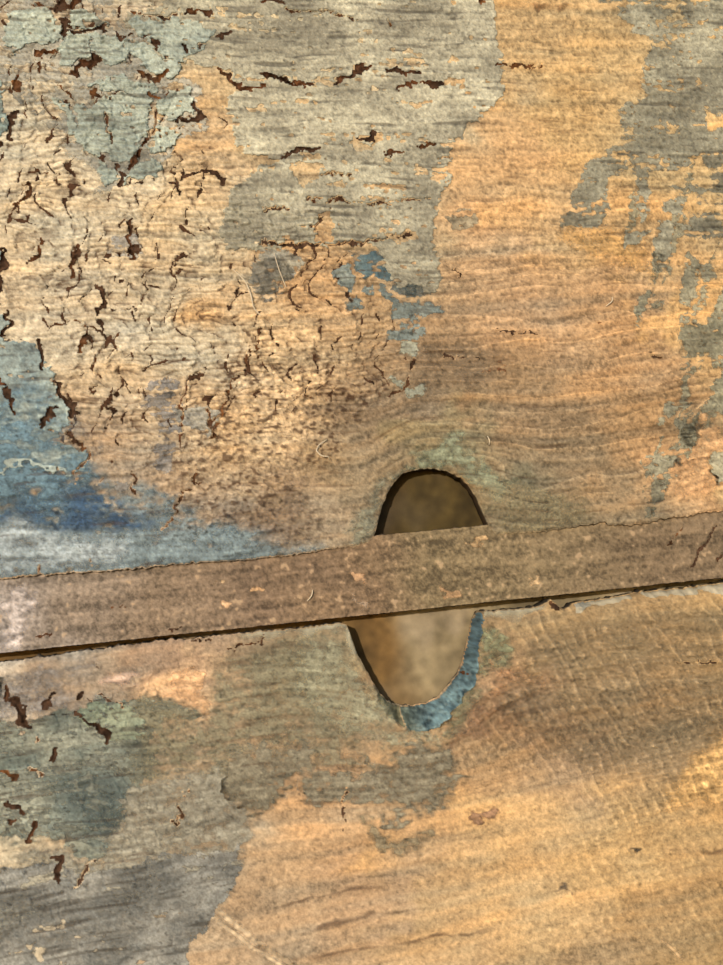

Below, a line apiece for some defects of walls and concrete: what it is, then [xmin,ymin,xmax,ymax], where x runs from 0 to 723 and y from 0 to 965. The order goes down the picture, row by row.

crack [495,62,543,70]
crack [0,0,450,495]
peeling [0,0,505,357]
crack [496,328,538,336]
peeling [560,0,723,518]
peeling [0,314,174,575]
peeling [141,377,221,473]
crack [161,469,202,530]
peeling [1,588,38,650]
crack [0,685,123,844]
crack [50,855,97,889]
peeling [0,695,243,965]